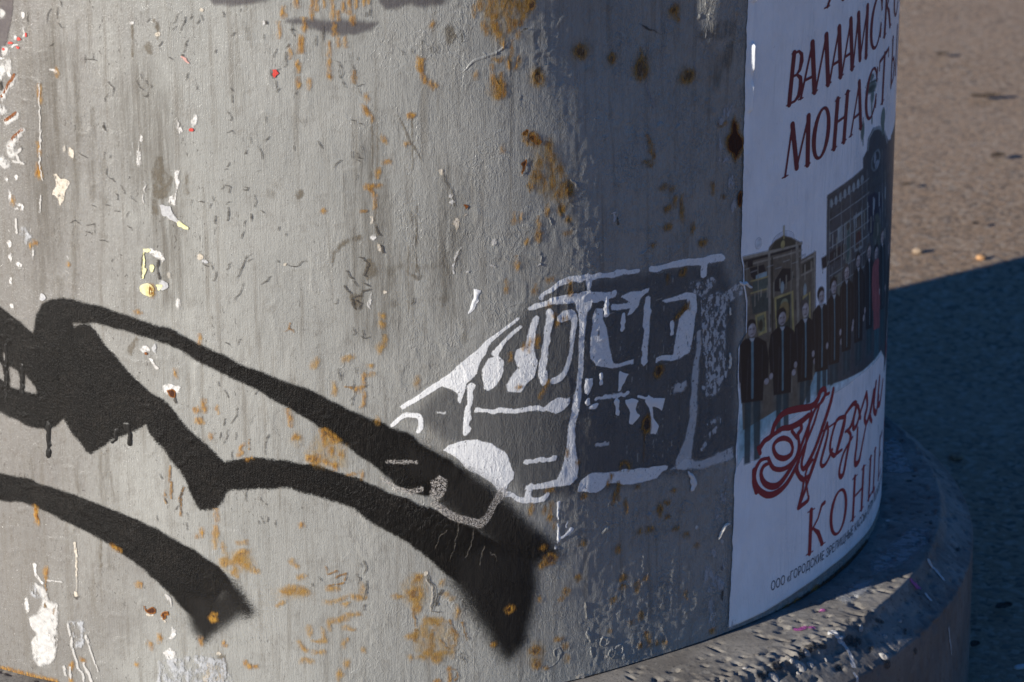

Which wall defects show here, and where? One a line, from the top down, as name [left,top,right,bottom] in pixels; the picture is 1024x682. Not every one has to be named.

corrosion [289,0,370,78]
corrosion [474,0,536,99]
peeling [0,12,34,284]
peeling [38,83,70,212]
corrosion [521,129,573,245]
corrosion [718,118,744,163]
peeling [140,248,170,297]
corrosion [306,428,343,469]
peeling [25,563,98,682]
corrosion [396,575,467,682]